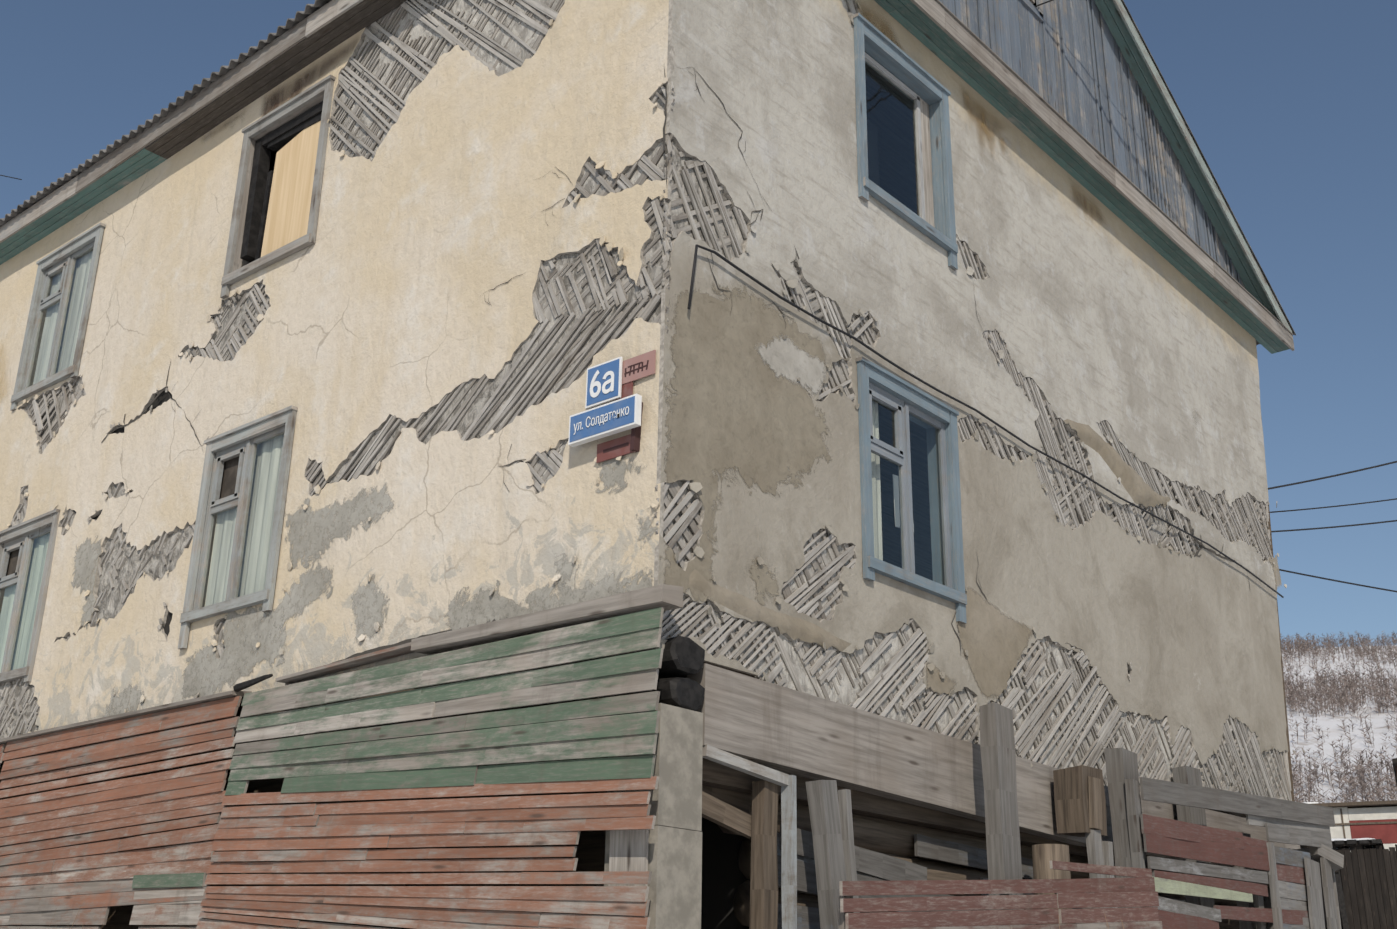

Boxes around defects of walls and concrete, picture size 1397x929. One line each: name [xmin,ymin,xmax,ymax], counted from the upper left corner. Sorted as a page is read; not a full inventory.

flaking render [599,236,624,266]
crack [101,362,208,445]
flaking render [60,483,195,640]
peeling [957,583,1037,698]
flaking render [0,669,40,739]